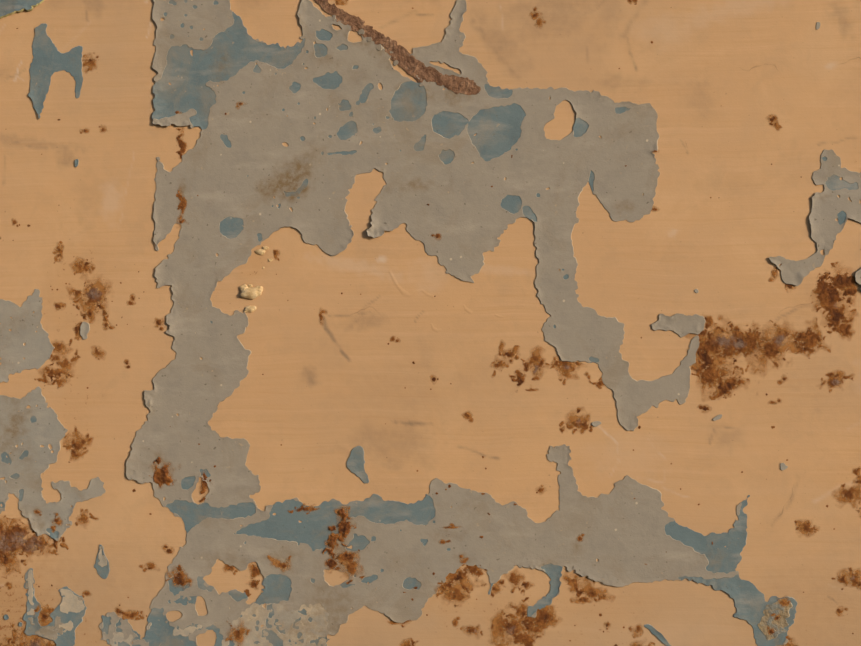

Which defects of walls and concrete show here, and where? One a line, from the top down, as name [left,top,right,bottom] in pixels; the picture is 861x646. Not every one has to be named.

peeling [28,23,83,119]
corrosion [315,0,481,95]
peeling [152,0,706,431]
peeling [769,149,861,286]
corrosion [34,259,128,387]
peeling [99,129,798,646]
corrosion [492,342,605,391]
corrosion [690,262,857,411]
peeling [0,386,106,541]
peeling [19,568,87,646]
corrosion [322,506,364,584]
corrosion [432,555,558,646]